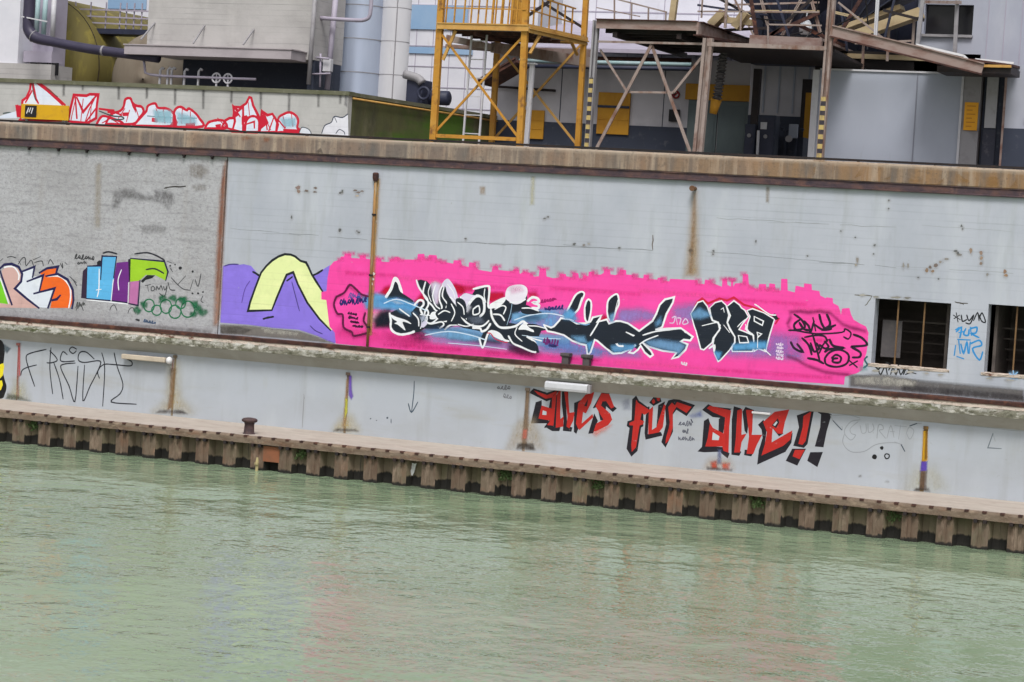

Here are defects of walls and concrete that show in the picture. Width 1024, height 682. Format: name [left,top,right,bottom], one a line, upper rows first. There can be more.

rust [369,179,379,335]